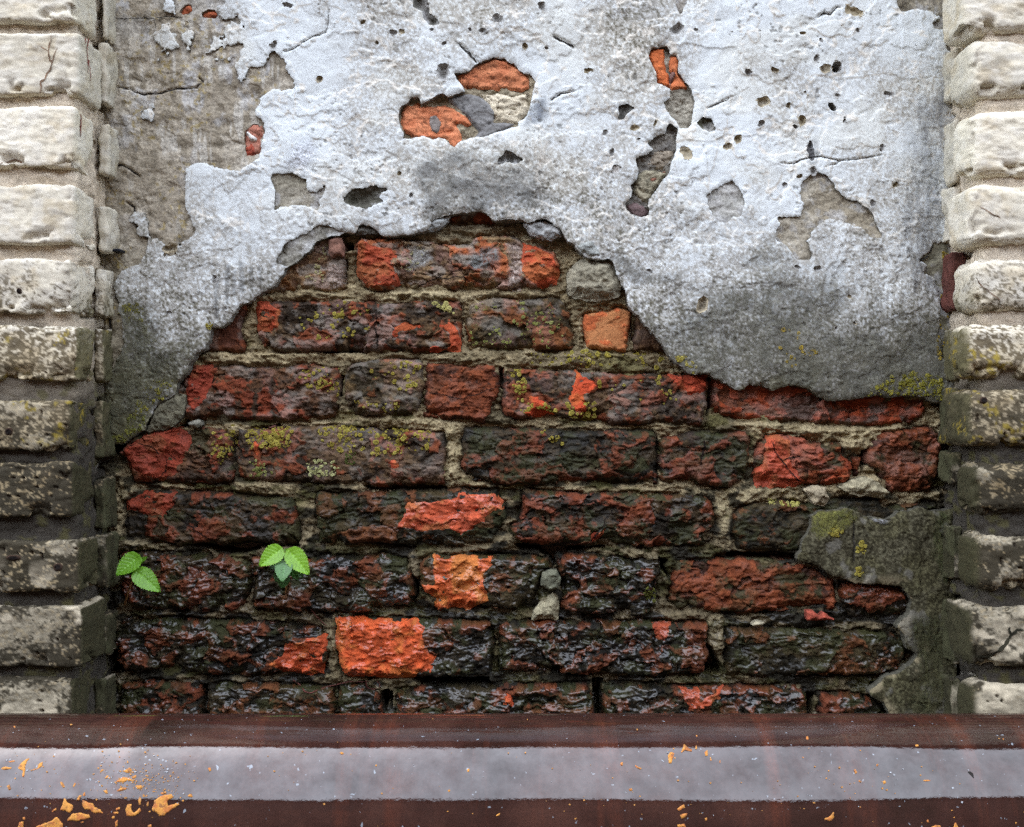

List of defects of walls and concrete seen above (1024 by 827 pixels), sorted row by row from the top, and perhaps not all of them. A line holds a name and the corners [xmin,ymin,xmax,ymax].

flaking render [98,0,295,368]
flaking render [271,173,326,210]
flaking render [344,186,387,208]
spalling [399,59,535,147]
spalling [618,48,715,217]
crack [784,156,874,165]
leakage [110,306,176,421]
spalling [99,212,951,714]